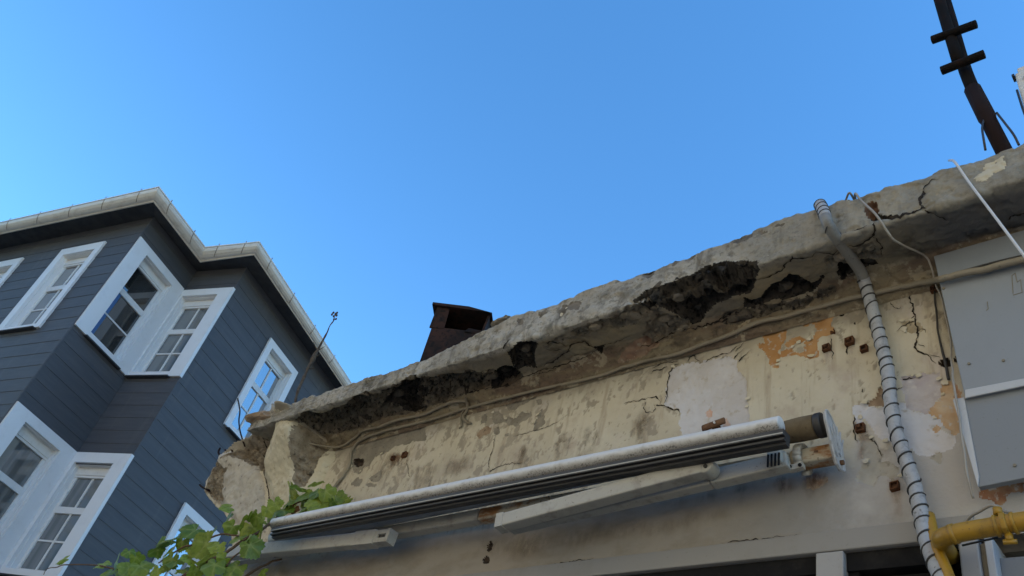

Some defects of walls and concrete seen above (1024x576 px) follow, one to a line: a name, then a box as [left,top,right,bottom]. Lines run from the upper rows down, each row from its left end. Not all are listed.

crack [764,179,947,279]
spalling [205,434,272,502]
crack [409,312,749,413]
spalling [288,242,882,487]
peeling [852,385,902,487]
crack [890,296,939,362]
peeling [898,356,963,464]